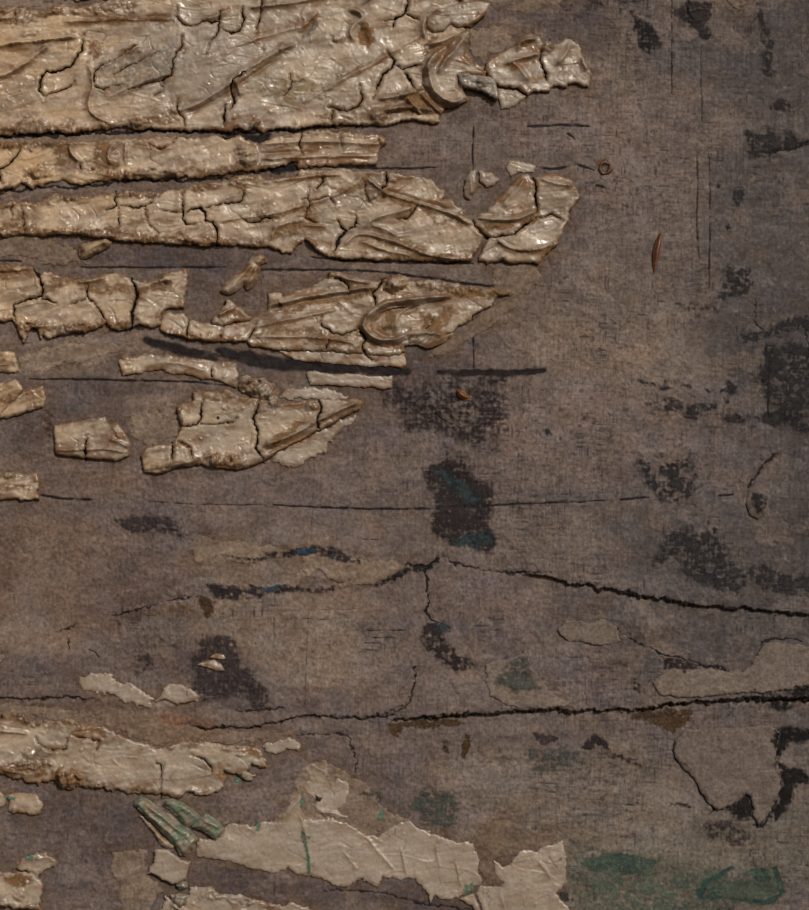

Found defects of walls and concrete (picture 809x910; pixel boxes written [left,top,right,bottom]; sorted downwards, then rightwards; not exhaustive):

peeling [0,0,592,265]
peeling [0,264,512,474]
damp [638,315,809,432]
damp [422,456,497,553]
crack [405,556,552,629]
crack [576,583,808,615]
damp [655,521,809,594]
peeling [0,712,301,815]
crack [197,665,583,773]
crack [637,696,809,712]
flaking render [673,725,781,826]
peeling [148,763,569,910]